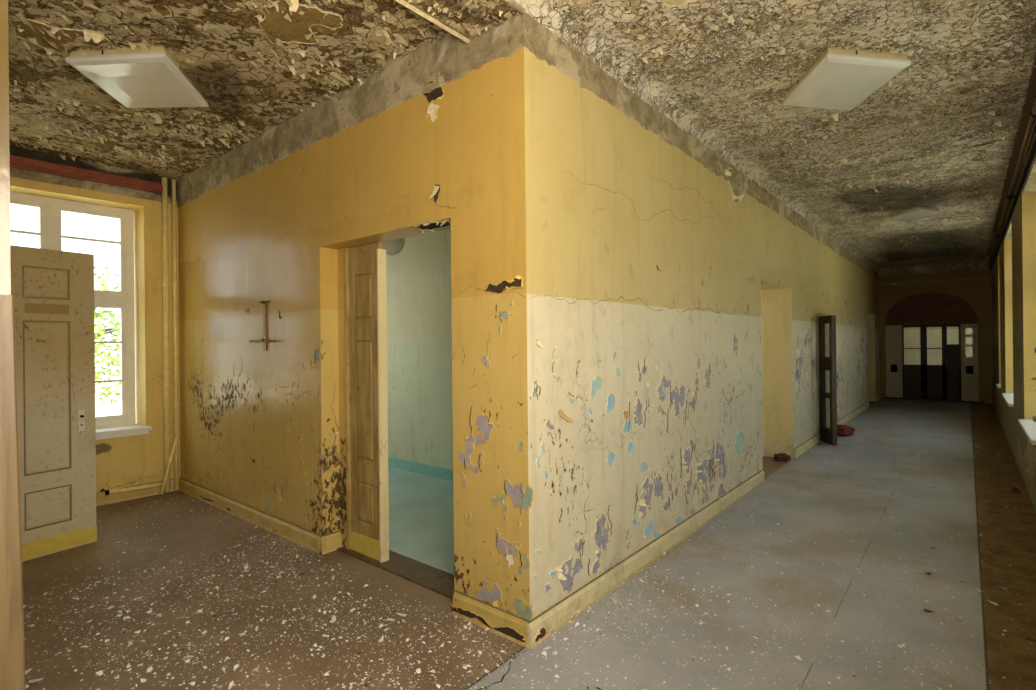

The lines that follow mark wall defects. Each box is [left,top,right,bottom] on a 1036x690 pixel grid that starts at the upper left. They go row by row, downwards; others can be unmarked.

peeling [9,78,264,169]
peeling [236,0,365,112]
flaking render [423,78,445,123]
peeling [366,0,508,65]
peeling [607,0,826,72]
peeling [705,0,1036,175]
flaking render [414,220,451,233]
peeling [485,275,523,335]
spalling [22,352,844,690]
crack [478,649,532,690]